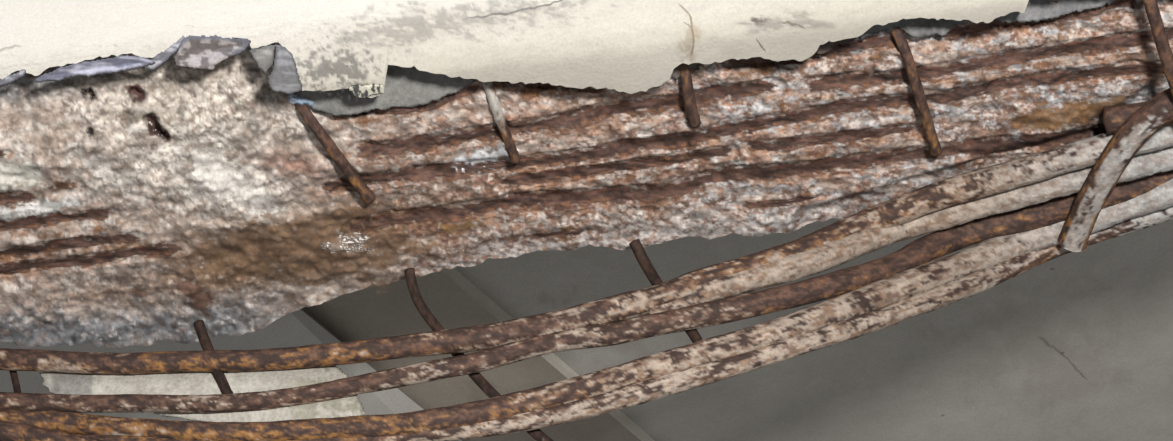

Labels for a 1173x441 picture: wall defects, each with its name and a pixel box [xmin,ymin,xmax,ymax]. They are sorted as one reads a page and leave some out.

rust [0,0,1173,316]
spalling [0,0,1173,348]